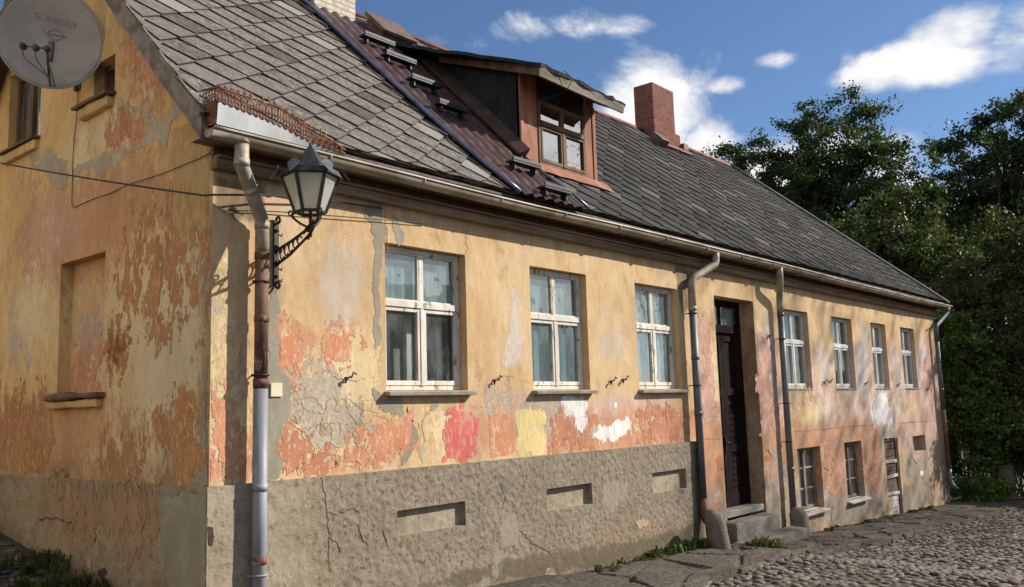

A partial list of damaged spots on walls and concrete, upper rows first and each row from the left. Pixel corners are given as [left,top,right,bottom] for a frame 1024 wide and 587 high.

peeling [104,38,162,162]
peeling [0,375,56,476]
peeling [70,180,212,393]
peeling [98,370,249,487]
rust [253,251,270,389]
peeling [270,310,368,393]
peeling [274,409,421,480]
crack [286,376,432,572]
peeling [548,405,602,455]
peeling [635,398,687,445]
peeling [755,332,815,440]